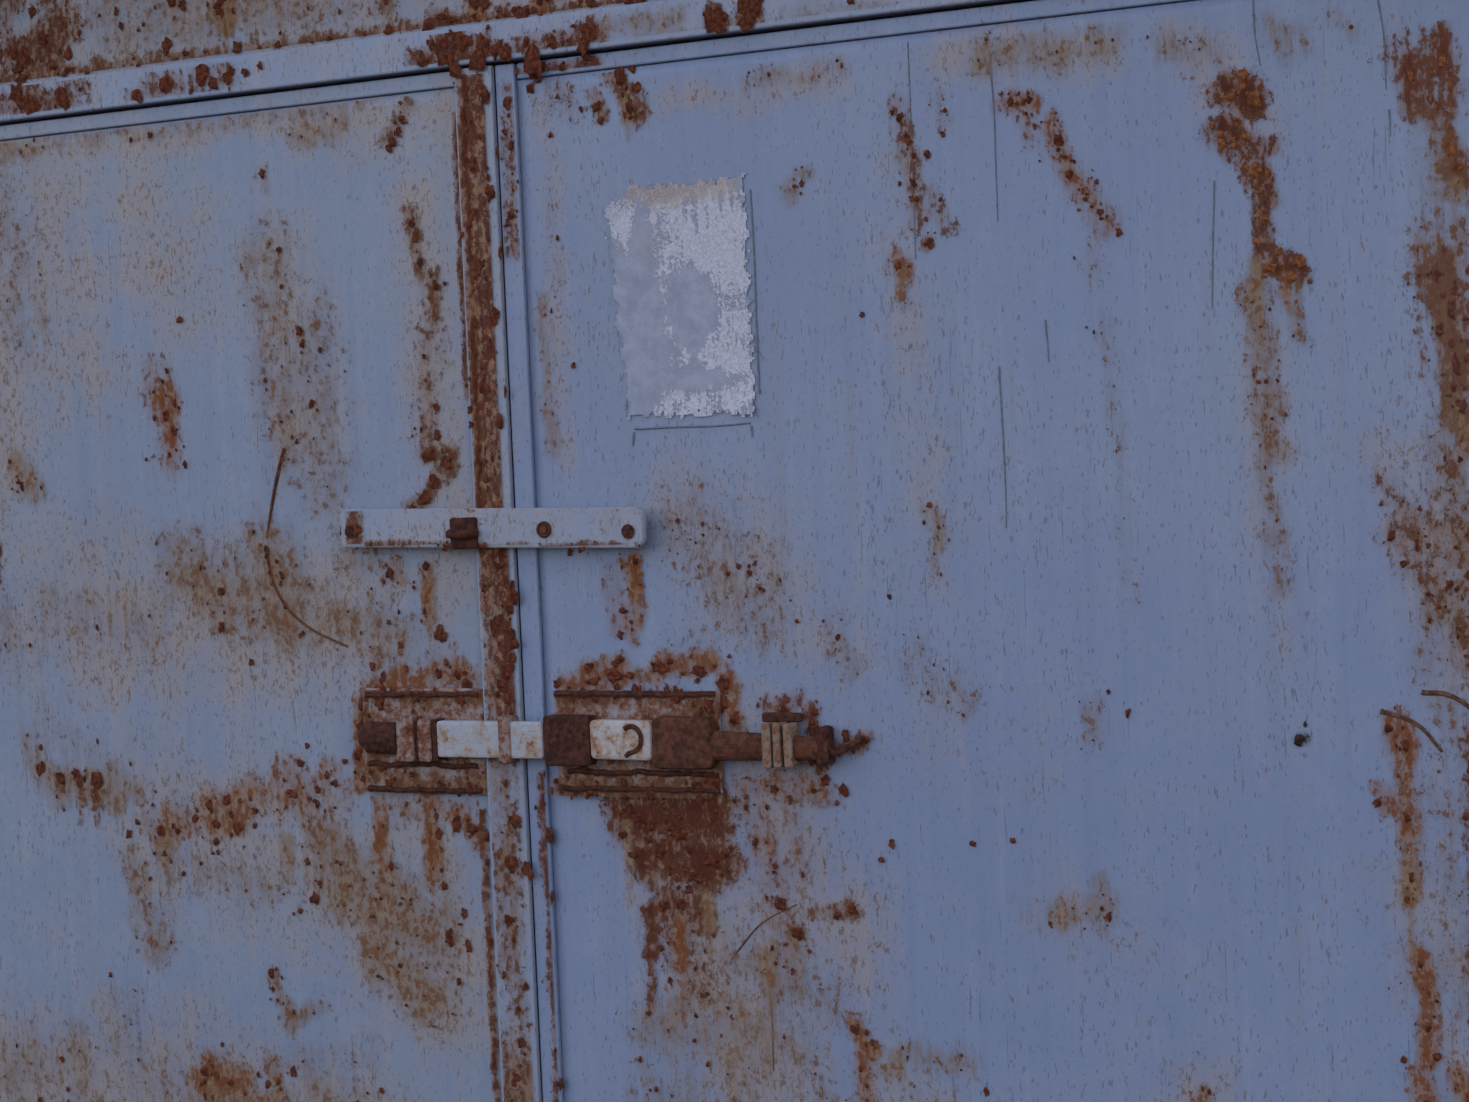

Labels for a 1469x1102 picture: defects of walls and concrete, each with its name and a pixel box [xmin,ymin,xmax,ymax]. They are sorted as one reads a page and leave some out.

corrosion [745,58,843,92]
corrosion [965,23,1119,80]
corrosion [0,0,783,509]
corrosion [779,165,816,204]
corrosion [886,80,960,310]
corrosion [996,89,1123,295]
corrosion [1146,23,1314,597]
corrosion [1085,316,1128,491]
corrosion [0,192,989,1102]
corrosion [1079,689,1111,752]
corrosion [1006,871,1117,940]
corrosion [1189,1084,1216,1102]